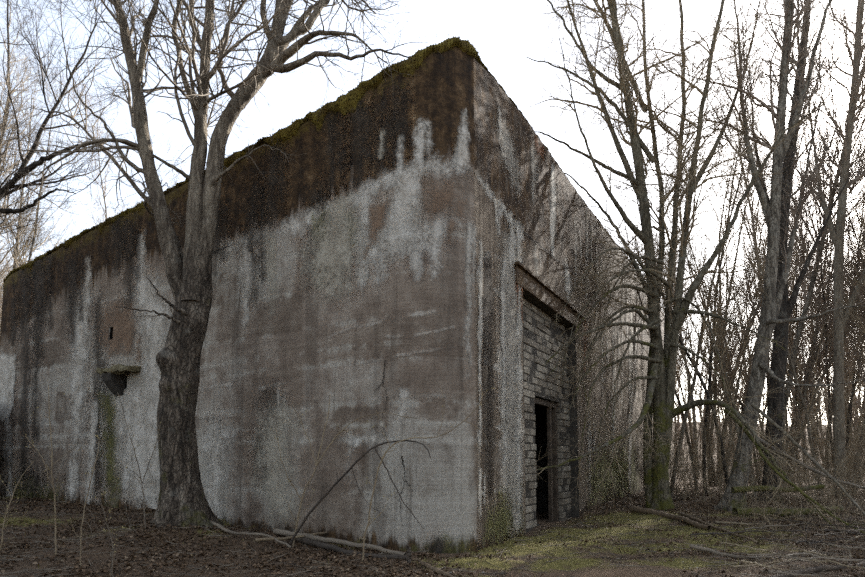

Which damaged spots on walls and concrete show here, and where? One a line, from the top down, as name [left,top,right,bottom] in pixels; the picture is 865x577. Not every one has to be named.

damp [66,226,169,509]
damp [213,102,524,533]
damp [550,164,559,256]